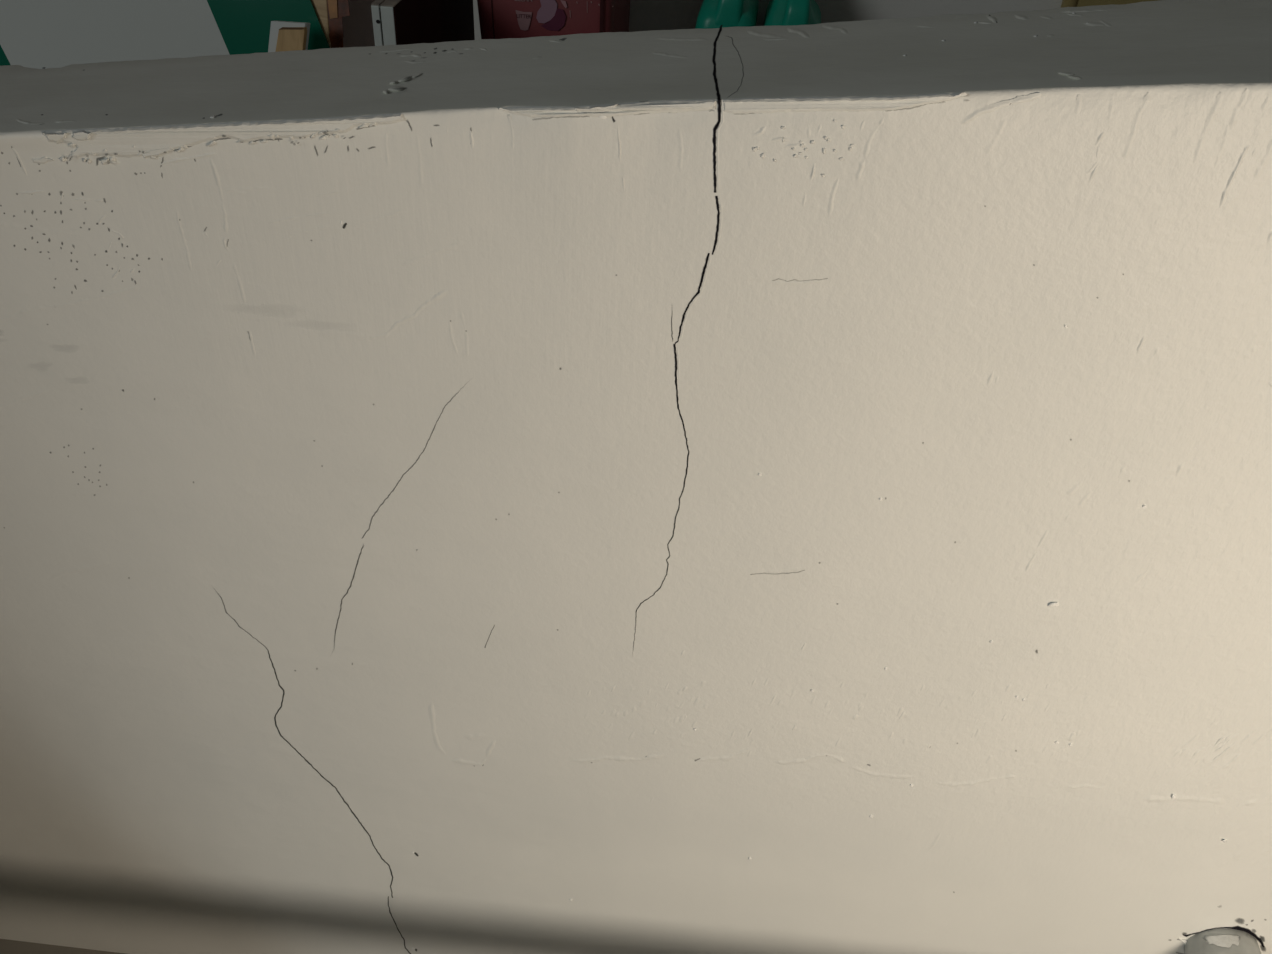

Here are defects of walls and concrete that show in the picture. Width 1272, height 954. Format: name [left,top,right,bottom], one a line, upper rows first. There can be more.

crack [633,25,744,647]
crack [334,399,452,640]
crack [218,594,411,954]